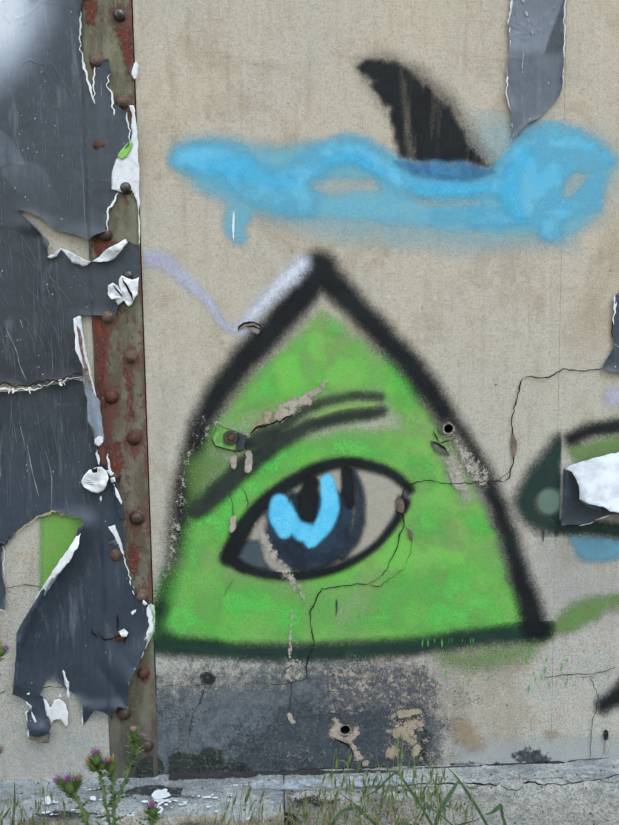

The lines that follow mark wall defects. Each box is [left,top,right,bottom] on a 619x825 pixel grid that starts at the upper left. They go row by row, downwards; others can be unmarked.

corrosion [116,26,134,82]
corrosion [94,238,117,258]
corrosion [93,317,108,409]
peeling [239,380,328,438]
crack [511,368,602,434]
corrosion [103,441,125,477]
corrosion [128,544,142,580]
crack [252,457,515,685]
peeling [324,659,473,766]
crack [279,667,619,791]
peeling [251,776,420,789]